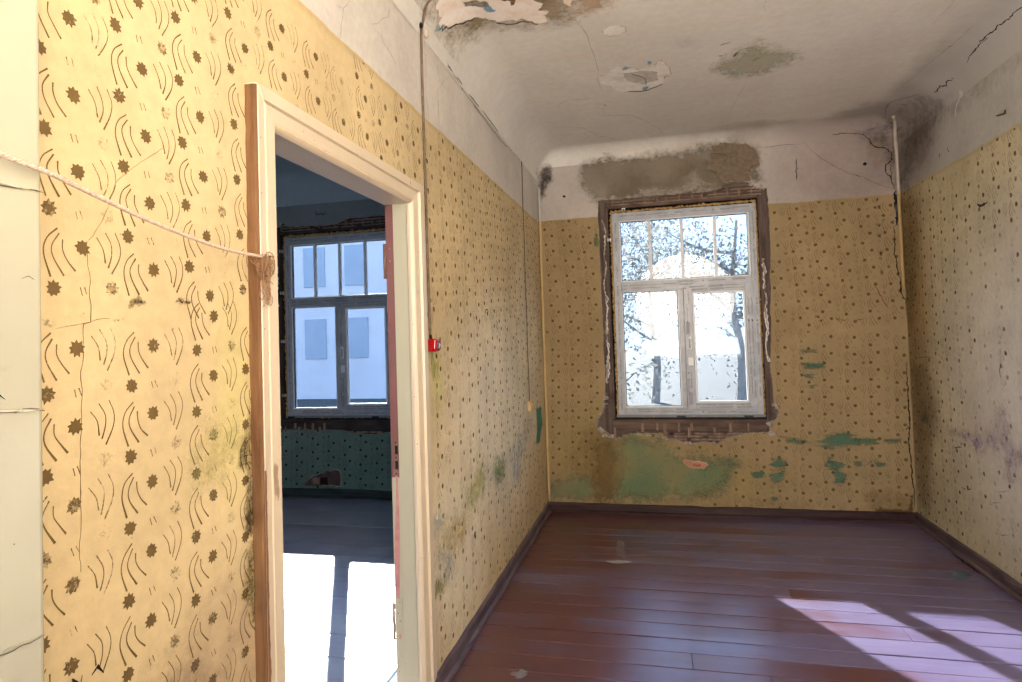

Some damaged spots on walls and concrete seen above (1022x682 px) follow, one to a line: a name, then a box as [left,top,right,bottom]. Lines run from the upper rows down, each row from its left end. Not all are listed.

leakage [448,17,496,37]
peeling [434,0,549,32]
leakage [534,0,573,20]
peeling [599,59,672,92]
crack [885,7,1022,114]
spalling [610,142,767,200]
crack [893,226,907,315]
crack [42,147,165,563]
spalling [595,220,780,445]
crack [0,406,45,414]
peeling [787,433,900,483]
crack [0,633,45,656]